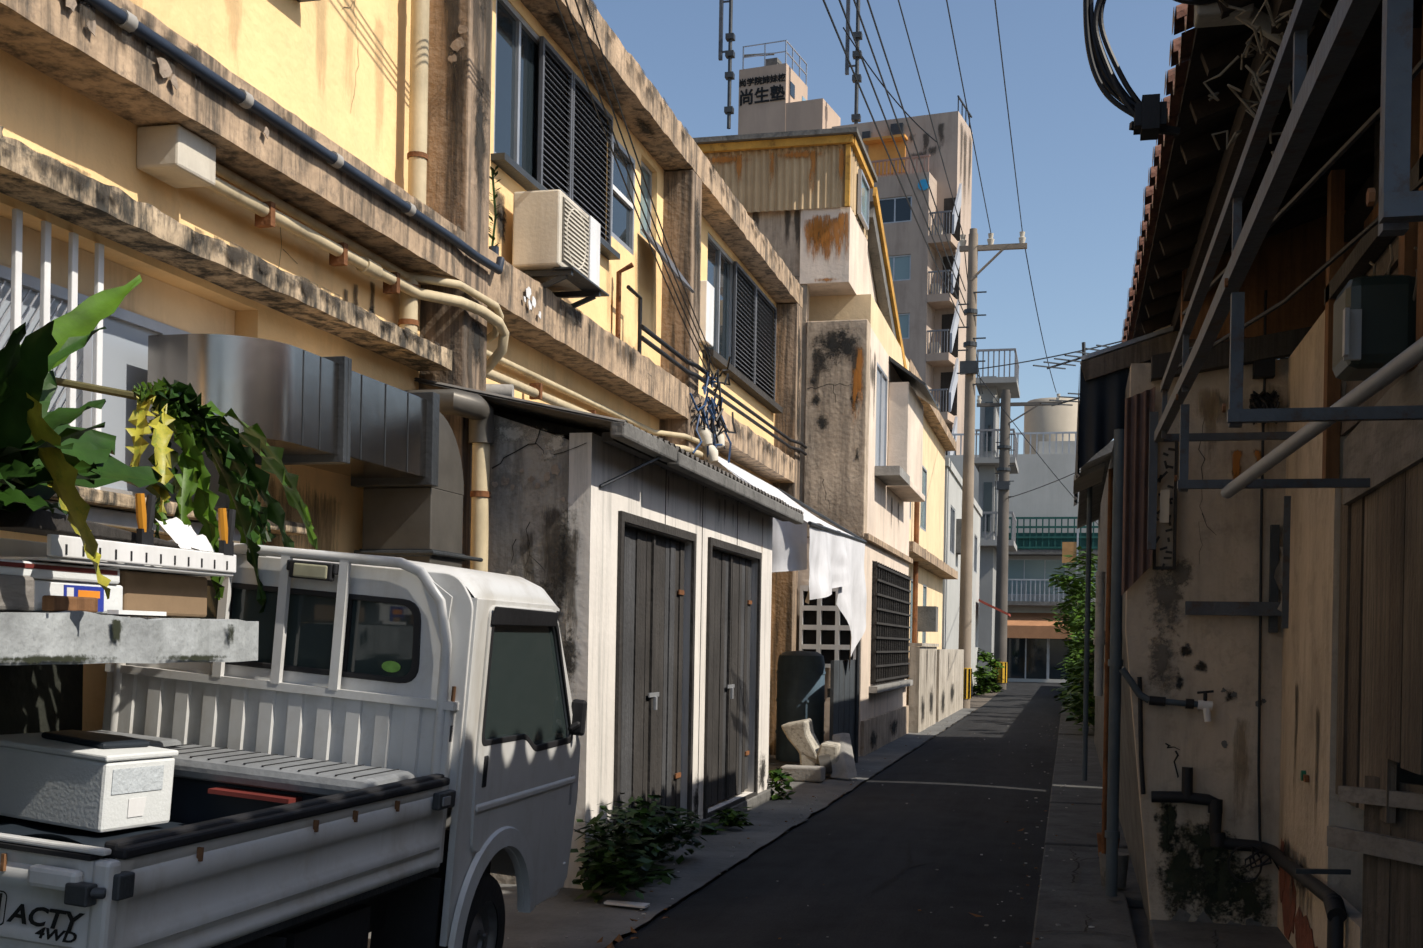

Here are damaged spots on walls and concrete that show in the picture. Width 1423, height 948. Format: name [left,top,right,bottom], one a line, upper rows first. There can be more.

damp [122,5,201,81]
damp [287,111,317,153]
damp [37,153,123,203]
rust [804,212,849,259]
damp [195,227,441,354]
damp [735,329,876,470]
damp [523,509,580,681]
damp [1176,644,1207,689]
mould [1154,803,1273,925]